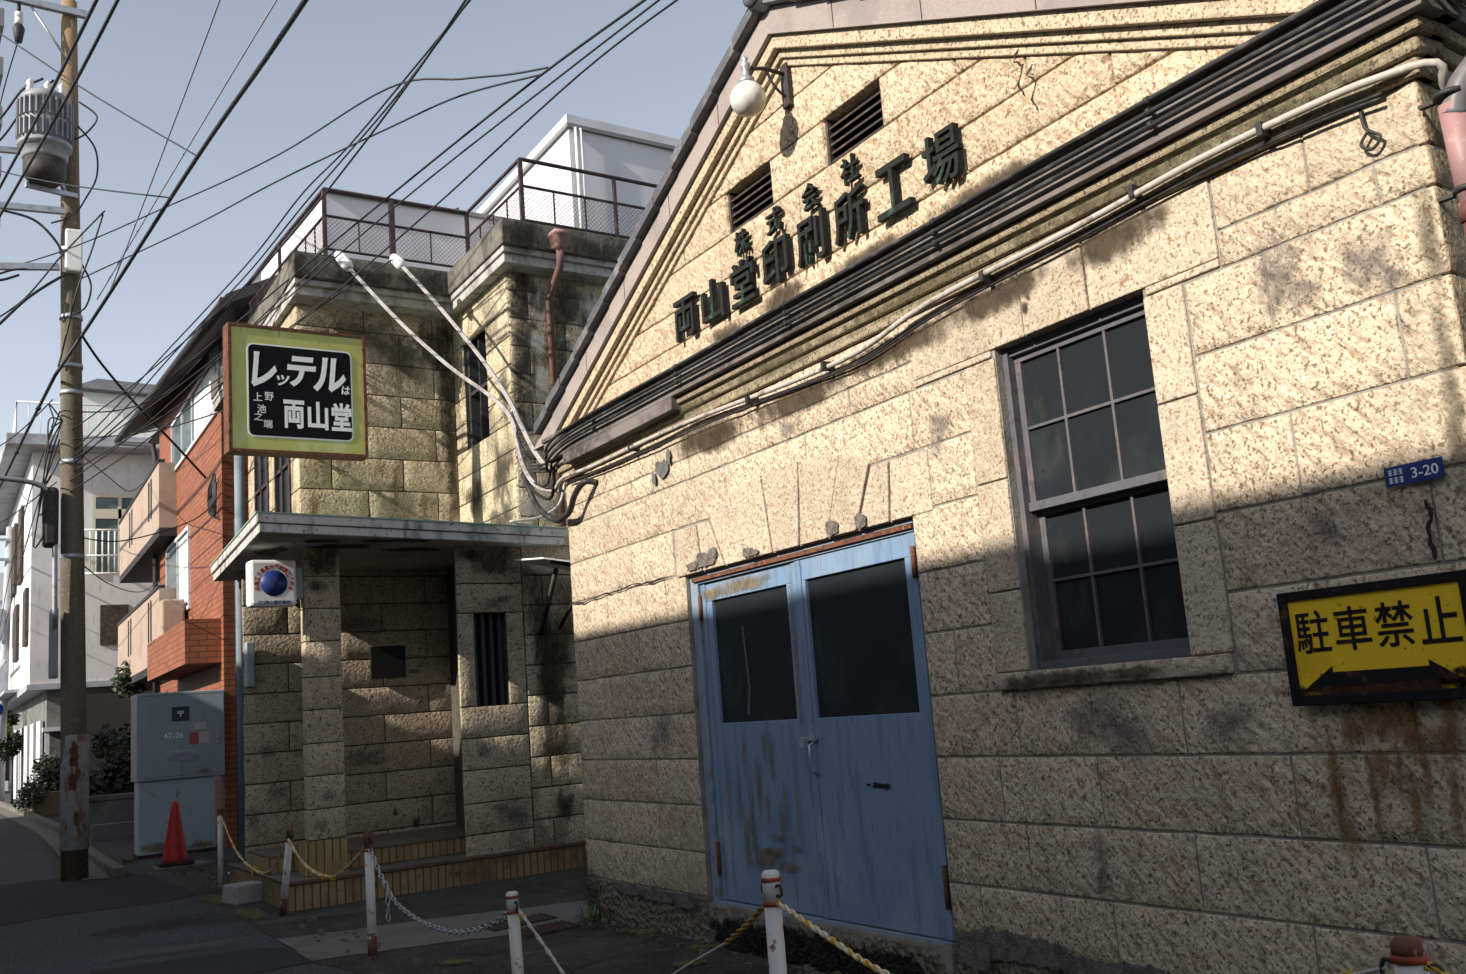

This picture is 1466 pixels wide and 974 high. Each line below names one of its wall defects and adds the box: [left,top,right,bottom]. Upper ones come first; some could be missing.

water stain [289,251,305,272]
water stain [340,267,442,297]
water stain [419,275,598,524]
crack [1424,499,1437,560]
water stain [529,582,565,755]
rust [68,742,81,790]
water stain [558,791,574,816]
rust [724,731,800,872]
rust [1326,700,1462,853]